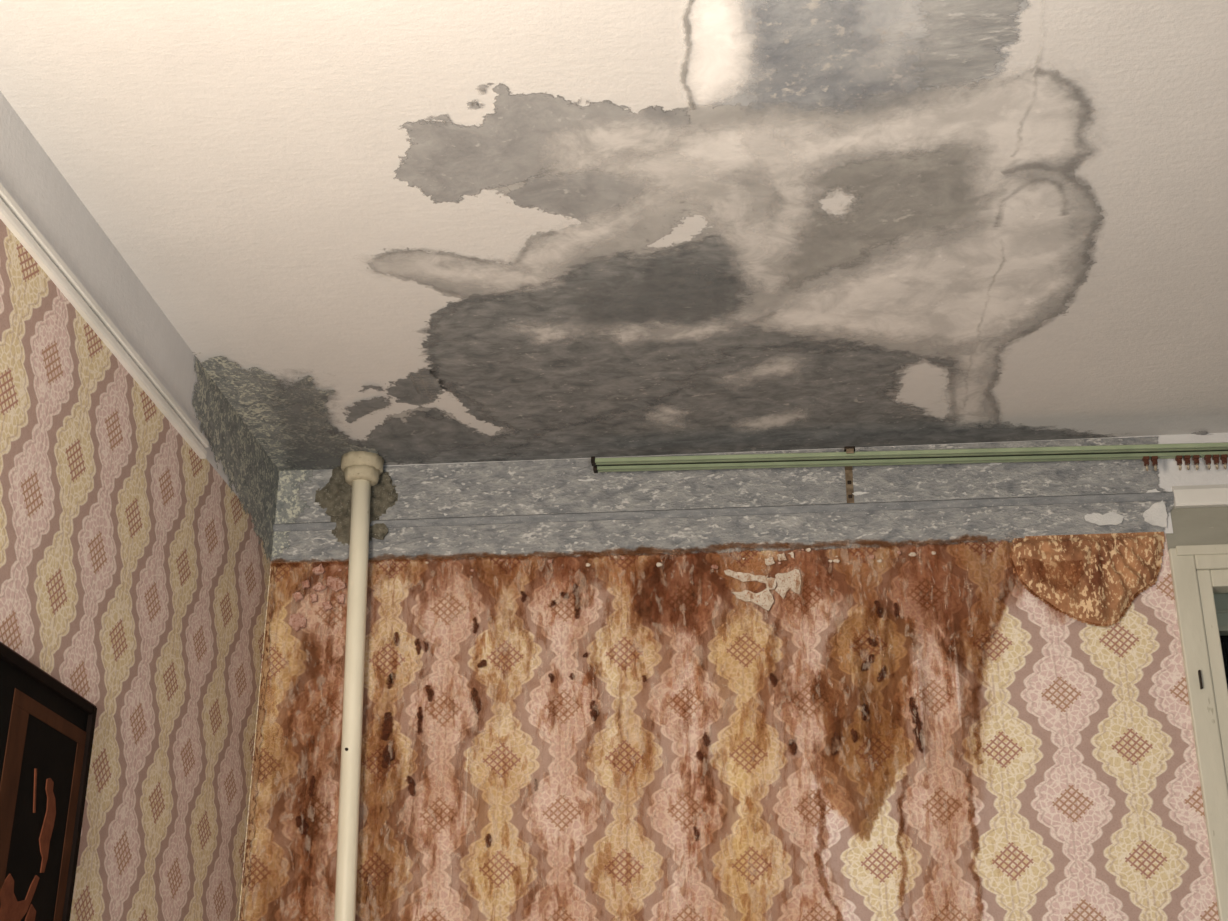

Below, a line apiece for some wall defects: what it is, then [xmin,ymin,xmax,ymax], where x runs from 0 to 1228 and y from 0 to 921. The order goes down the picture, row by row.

crack [681,0,693,110]
leakage [192,0,1111,593]
flaking render [271,466,352,604]
leakage [461,547,670,620]
flaking render [368,436,1174,611]
leakage [859,536,975,647]
leakage [283,785,329,838]
leakage [875,713,904,852]